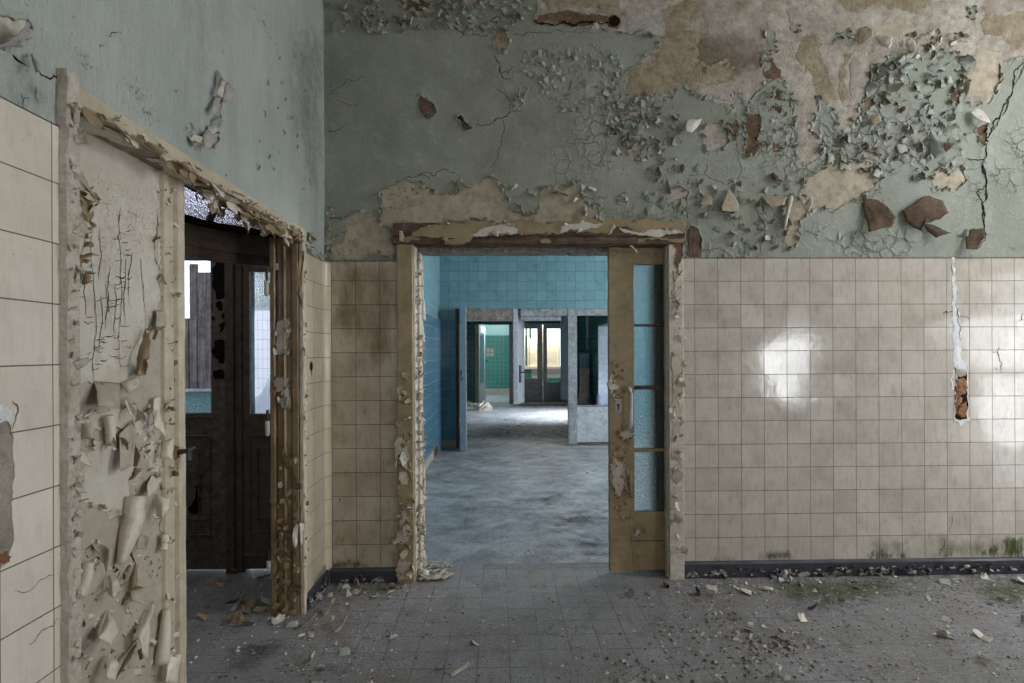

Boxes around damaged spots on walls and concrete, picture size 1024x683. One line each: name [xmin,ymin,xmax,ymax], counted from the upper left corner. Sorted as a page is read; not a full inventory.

peeling [0,6,34,59]
peeling [185,75,225,150]
peeling [195,185,303,246]
peeling [371,0,513,56]
peeling [323,174,602,264]
crack [461,29,594,166]
peeling [532,0,1024,251]
crack [968,62,1024,248]
spalling [0,404,15,568]
peeling [71,175,182,683]
peeling [221,318,454,629]
spalling [950,366,970,426]